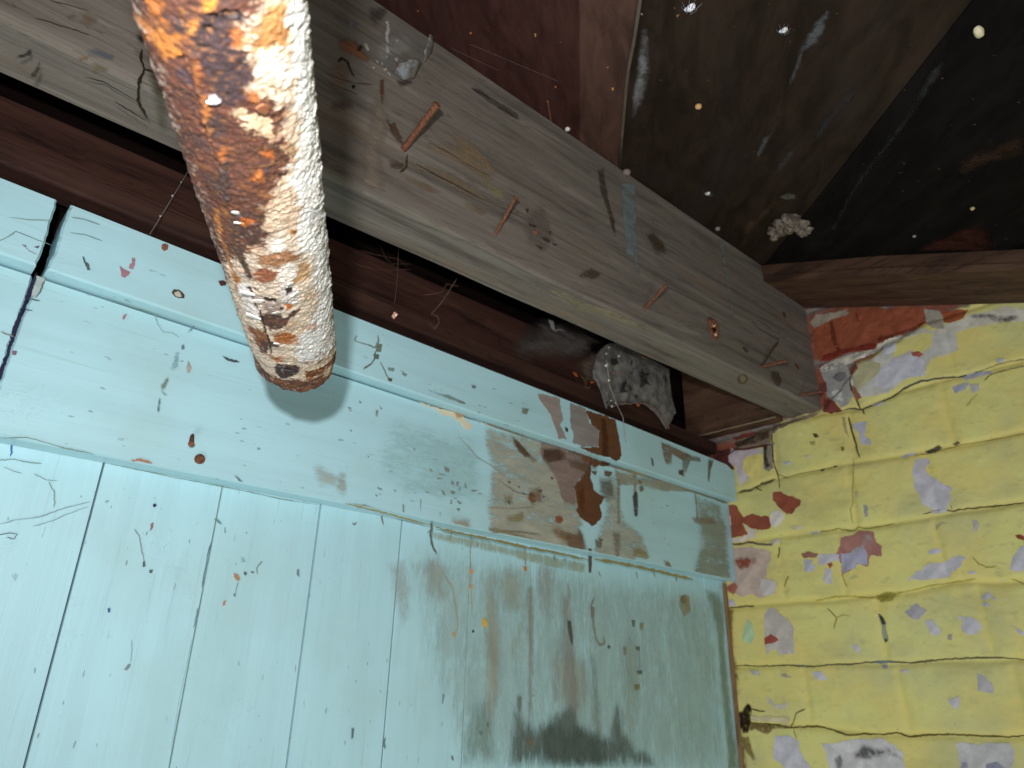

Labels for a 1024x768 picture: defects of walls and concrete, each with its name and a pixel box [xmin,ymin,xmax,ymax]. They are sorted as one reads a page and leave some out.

crack [0,245,45,380]
peeling [538,394,599,504]
spalling [662,306,1024,485]
crack [683,358,1024,587]
damp [427,437,690,668]
damp [512,584,650,765]
peeling [727,491,801,655]
peeling [739,695,811,768]
peeling [801,530,882,584]
peeling [821,738,906,768]
crack [735,614,1024,667]
crack [751,709,1024,738]